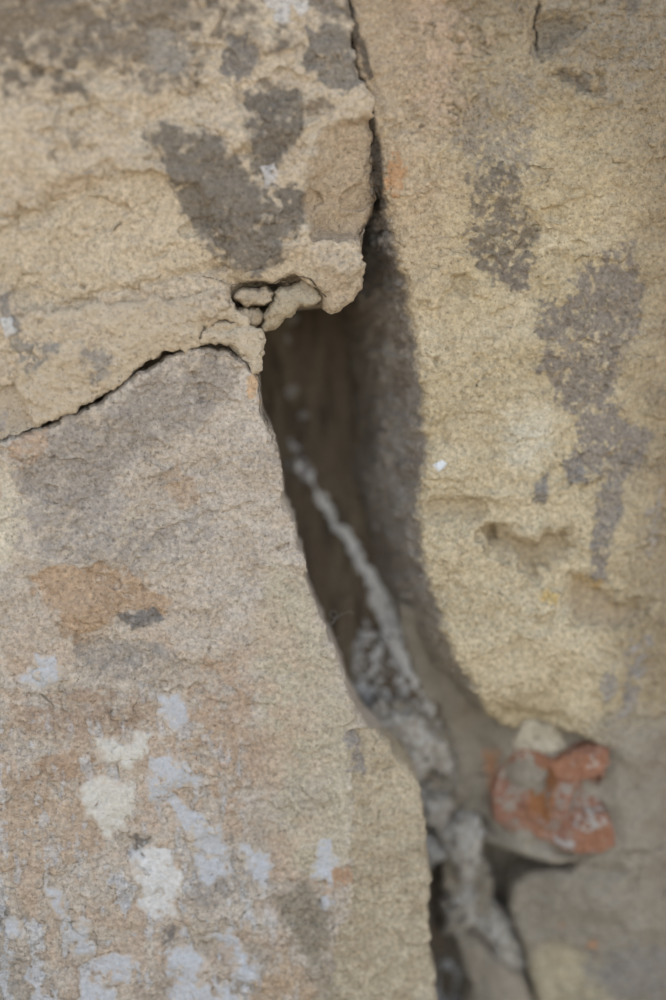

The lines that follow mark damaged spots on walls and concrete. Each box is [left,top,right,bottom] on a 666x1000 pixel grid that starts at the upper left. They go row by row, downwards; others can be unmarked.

crack [348,0,390,213]
crack [531,0,541,50]
crack [0,274,327,449]